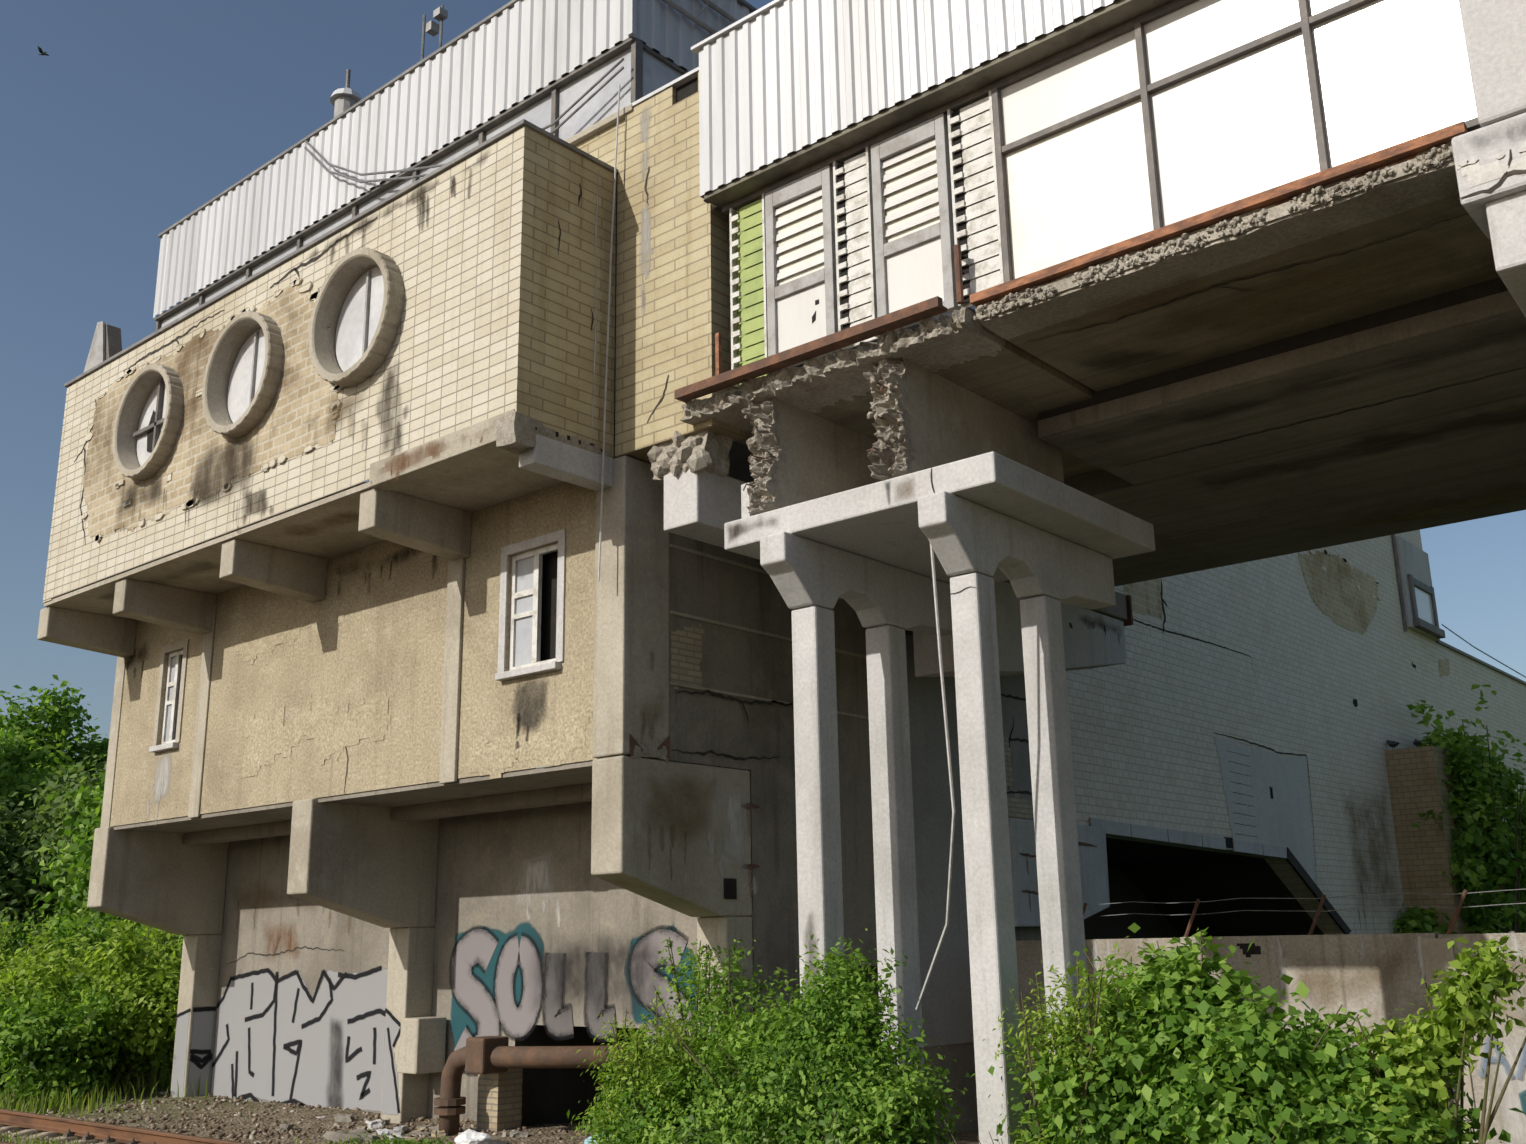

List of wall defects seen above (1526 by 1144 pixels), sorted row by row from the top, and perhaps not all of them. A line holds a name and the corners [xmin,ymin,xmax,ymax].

spalling [973,144,1526,321]
crack [1025,149,1526,343]
leakage [383,372,397,448]
leakage [121,480,165,528]
leakage [185,440,251,525]
leakage [233,491,271,520]
crack [1133,580,1254,674]
leakage [516,687,544,760]
crack [671,690,794,761]
crack [1001,694,1032,795]